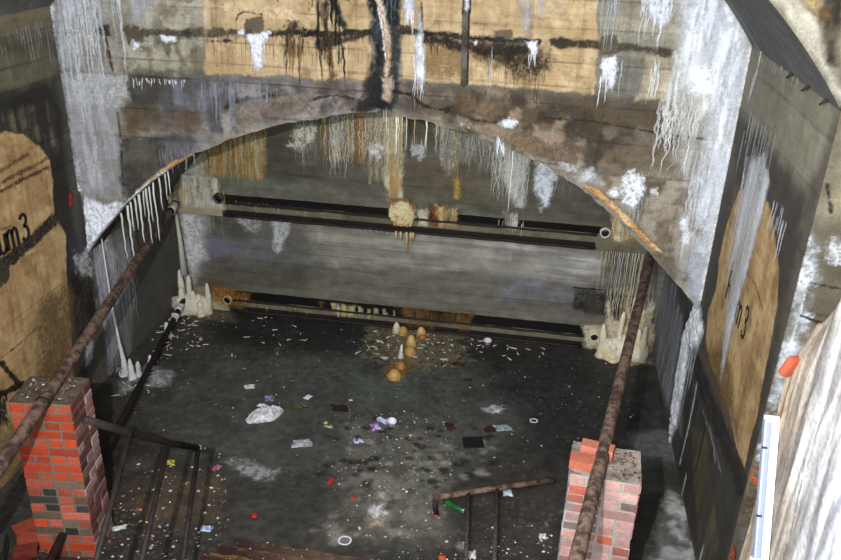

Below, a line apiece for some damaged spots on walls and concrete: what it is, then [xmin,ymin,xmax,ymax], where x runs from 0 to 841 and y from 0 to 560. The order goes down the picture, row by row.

leakage [550,0,617,49]
efflorescence [50,0,185,195]
leakage [221,0,537,184]
leakage [272,221,290,253]
leakage [435,122,596,231]
leakage [597,0,785,379]
efflorescence [828,240,841,266]
leakage [319,302,384,318]
efflorescence [769,257,815,410]